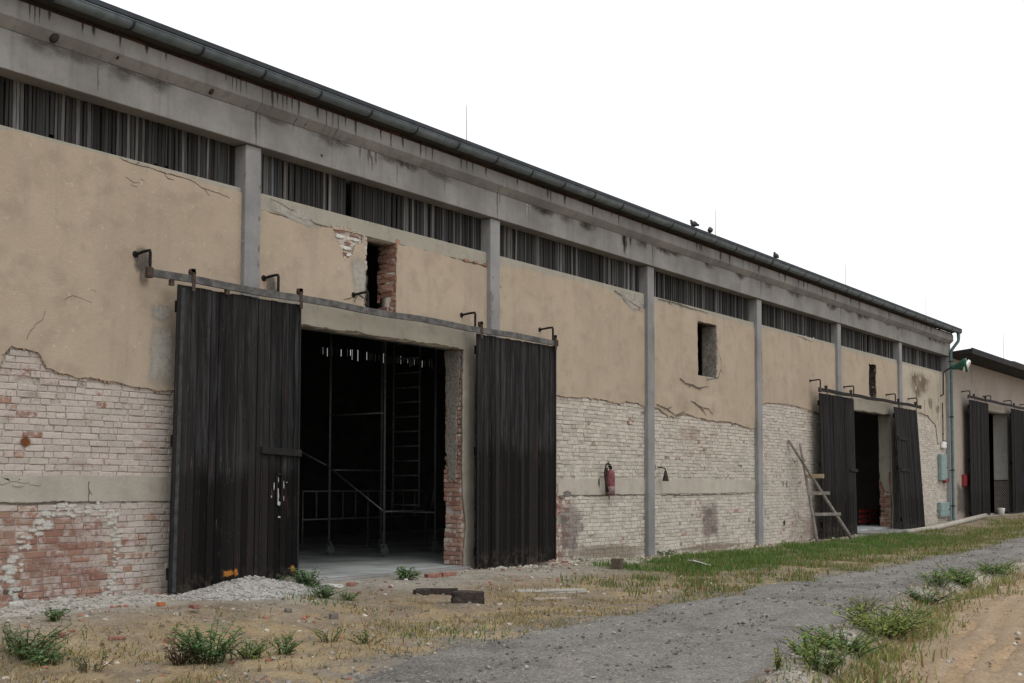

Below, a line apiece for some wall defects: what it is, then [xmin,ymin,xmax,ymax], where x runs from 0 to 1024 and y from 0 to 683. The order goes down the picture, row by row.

crack [120,157,230,199]
flaking render [329,225,367,270]
flaking render [0,345,174,487]
crack [657,346,722,415]
flaking render [499,395,822,567]
flaking render [0,500,173,608]